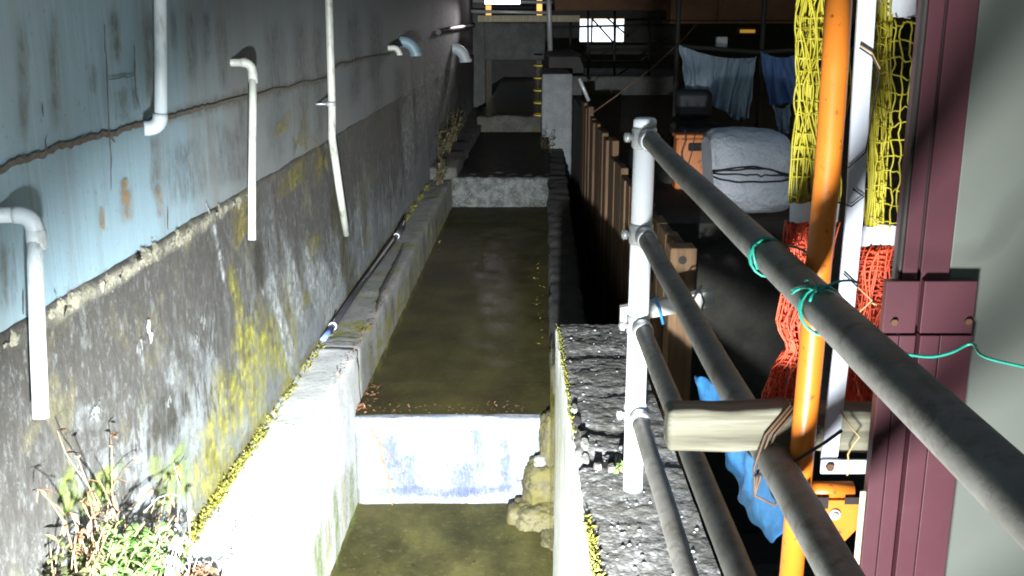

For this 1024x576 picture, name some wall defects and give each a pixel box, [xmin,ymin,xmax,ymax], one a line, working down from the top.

crack [0,24,144,189]
crack [168,54,390,170]
corrosion [122,180,130,218]
spalling [47,195,248,320]
spalling [3,329,19,350]
leakage [383,430,509,498]